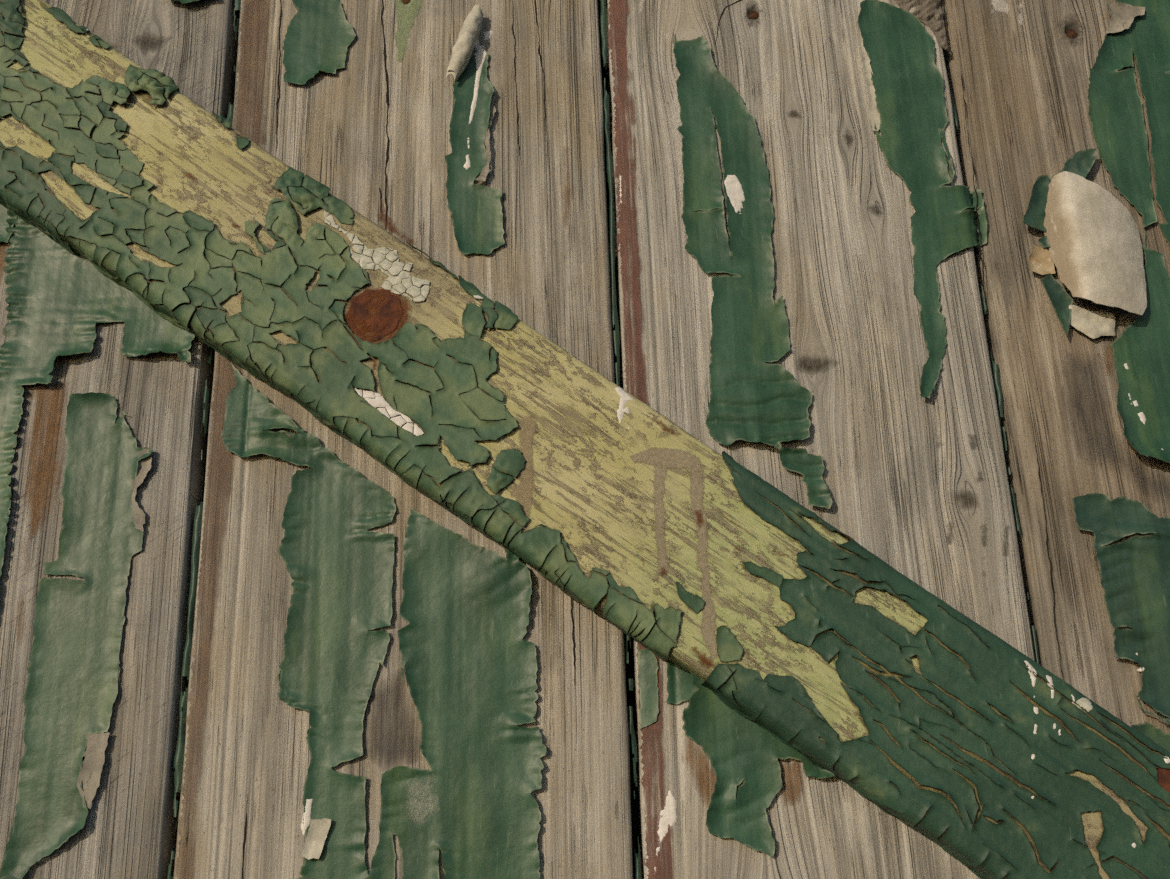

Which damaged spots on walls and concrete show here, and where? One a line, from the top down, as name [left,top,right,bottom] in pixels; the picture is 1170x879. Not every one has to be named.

peeling [0,204,195,577]
crack [0,0,704,686]
rust [347,289,410,343]
peeling [445,5,505,255]
peeling [666,33,832,509]
peeling [857,0,987,399]
crack [956,39,987,314]
peeling [1022,0,1170,463]
peeling [0,392,153,879]
crack [240,804,248,879]
peeling [221,361,547,879]
crack [701,446,1170,879]